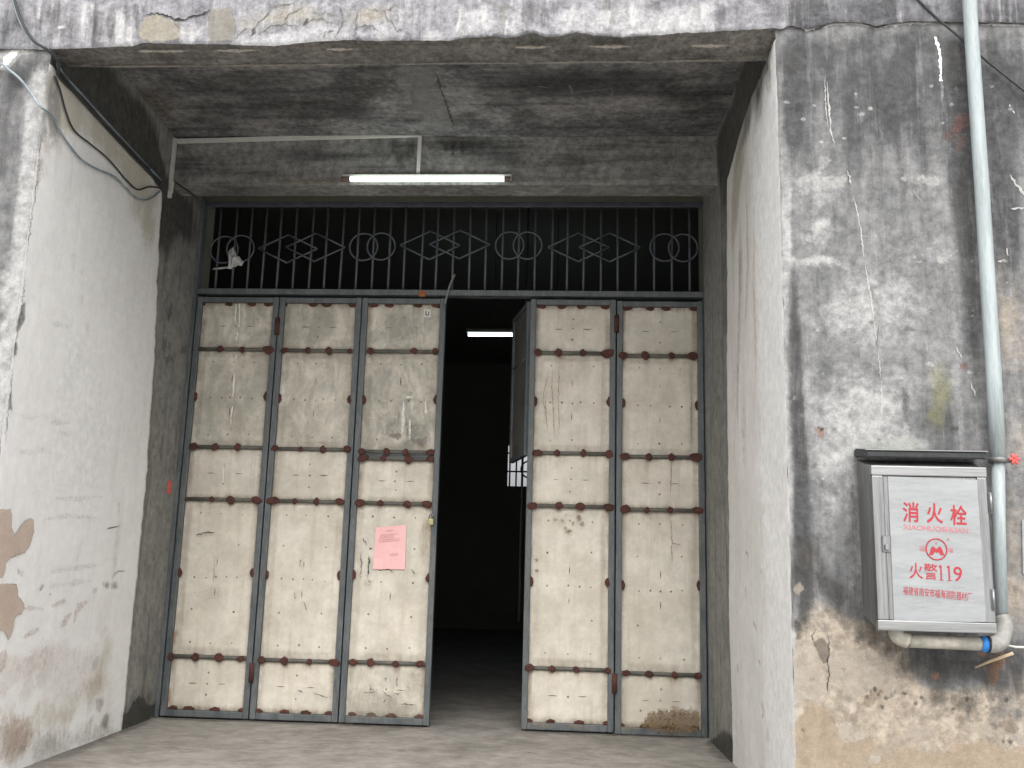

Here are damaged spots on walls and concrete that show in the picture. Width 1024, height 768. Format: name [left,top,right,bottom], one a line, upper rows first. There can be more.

crack [824,75,835,143]
crack [847,171,884,423]
peeling [0,509,34,639]